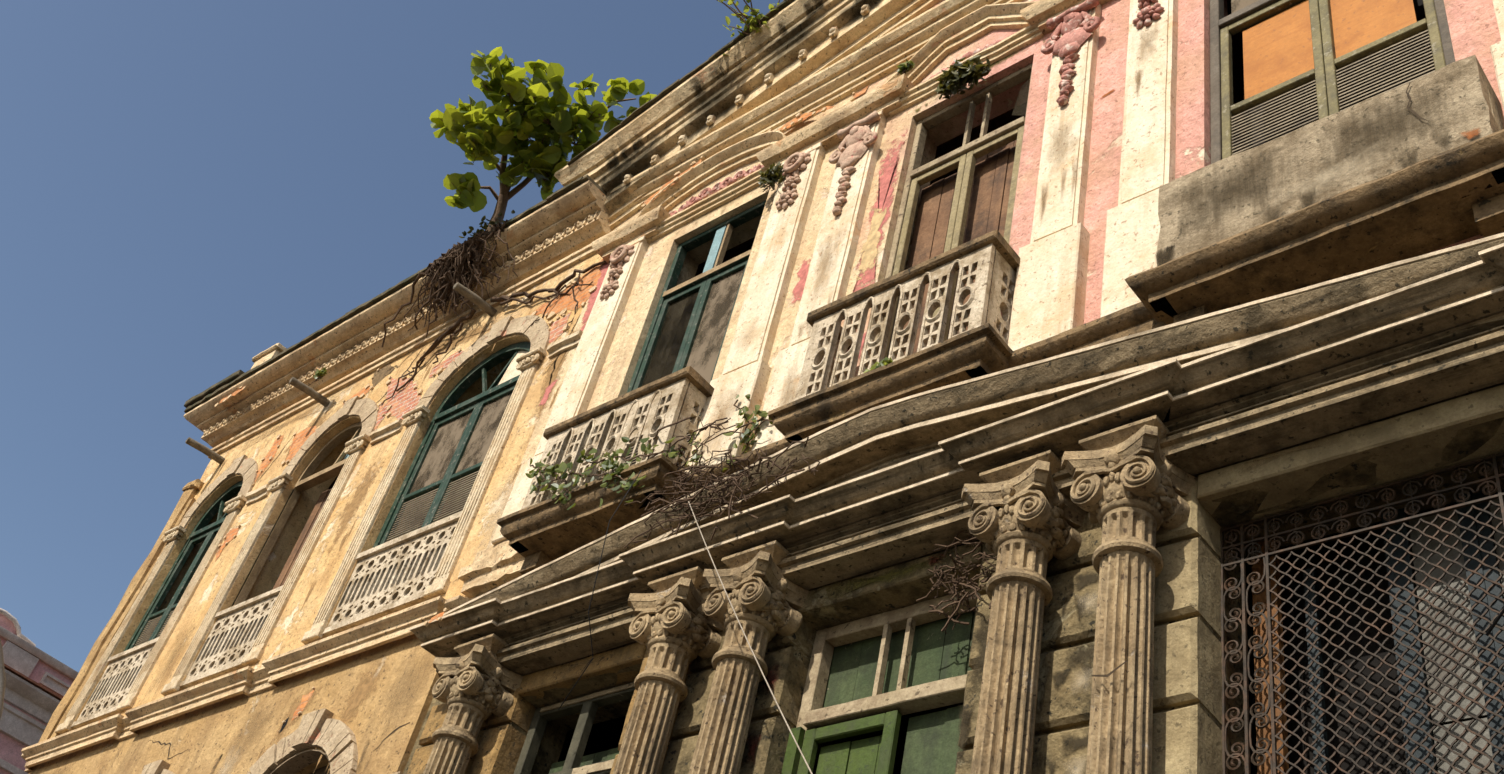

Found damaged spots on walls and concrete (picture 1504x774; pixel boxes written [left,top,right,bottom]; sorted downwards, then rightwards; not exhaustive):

leakage [1348,98,1421,152]
leakage [1200,168,1264,214]
spalling [531,259,605,417]
spalling [252,324,496,486]
flaking render [257,686,321,760]